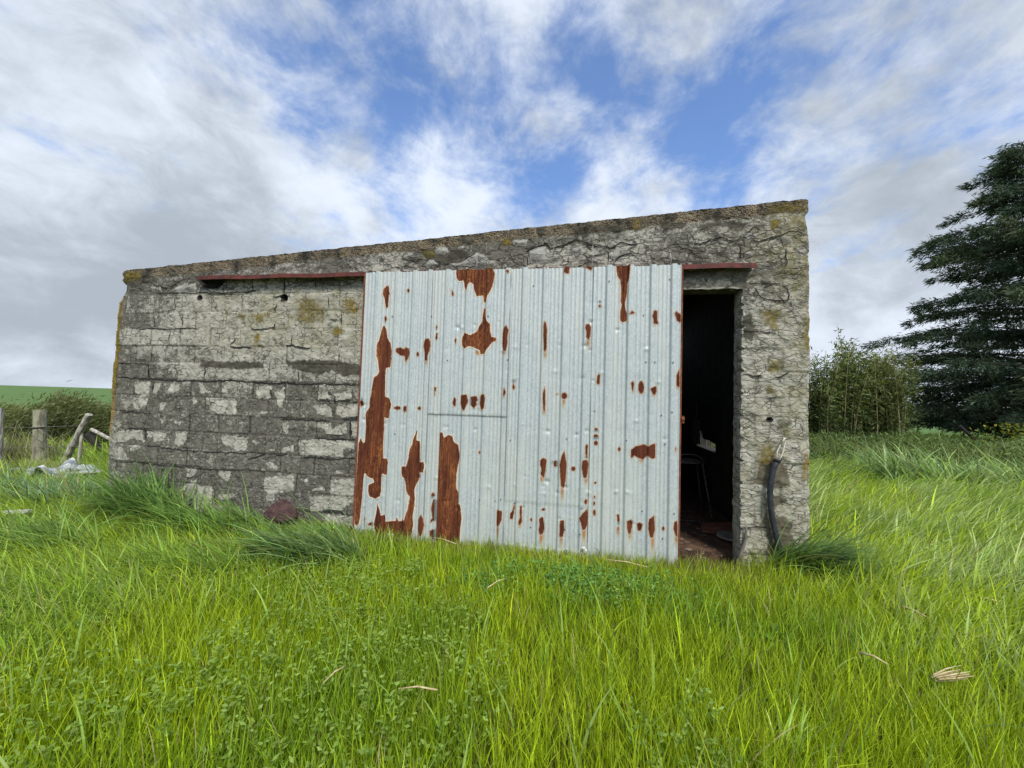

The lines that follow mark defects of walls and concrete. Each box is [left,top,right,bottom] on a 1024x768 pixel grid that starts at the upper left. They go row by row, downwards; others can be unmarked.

crack [526,239,639,265]
rust [451,268,509,355]
rust [615,264,635,324]
crack [677,216,808,399]
water stain [200,360,263,369]
water stain [286,359,360,376]
rust [354,284,463,544]
rust [452,394,485,411]
rust [617,443,656,462]
rust [540,428,599,541]